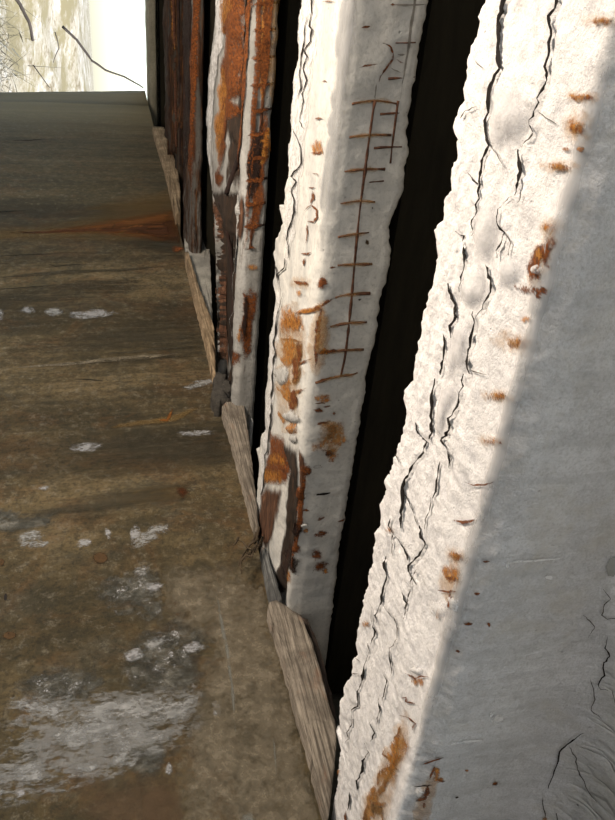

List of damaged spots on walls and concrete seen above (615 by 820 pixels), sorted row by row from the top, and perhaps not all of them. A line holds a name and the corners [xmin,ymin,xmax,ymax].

corrosion [206,0,262,250]
corrosion [569,119,583,134]
corrosion [514,224,557,299]
corrosion [237,289,258,357]
corrosion [273,299,336,444]
crack [332,0,559,820]
corrosion [430,552,462,618]
leakage [18,602,204,778]
crack [583,589,615,716]
leakage [15,764,42,781]
corrosion [363,727,407,820]
crack [542,733,596,820]